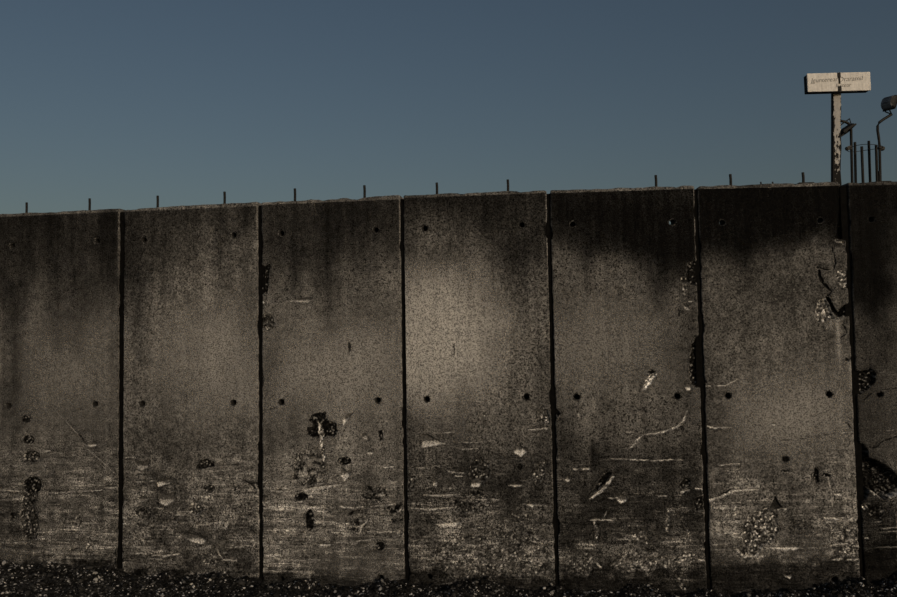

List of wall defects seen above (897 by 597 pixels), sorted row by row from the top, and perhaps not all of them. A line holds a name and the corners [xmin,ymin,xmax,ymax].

crack [814,241,838,298]
spalling [290,409,358,548]
spalling [860,441,897,522]
spalling [828,521,859,563]